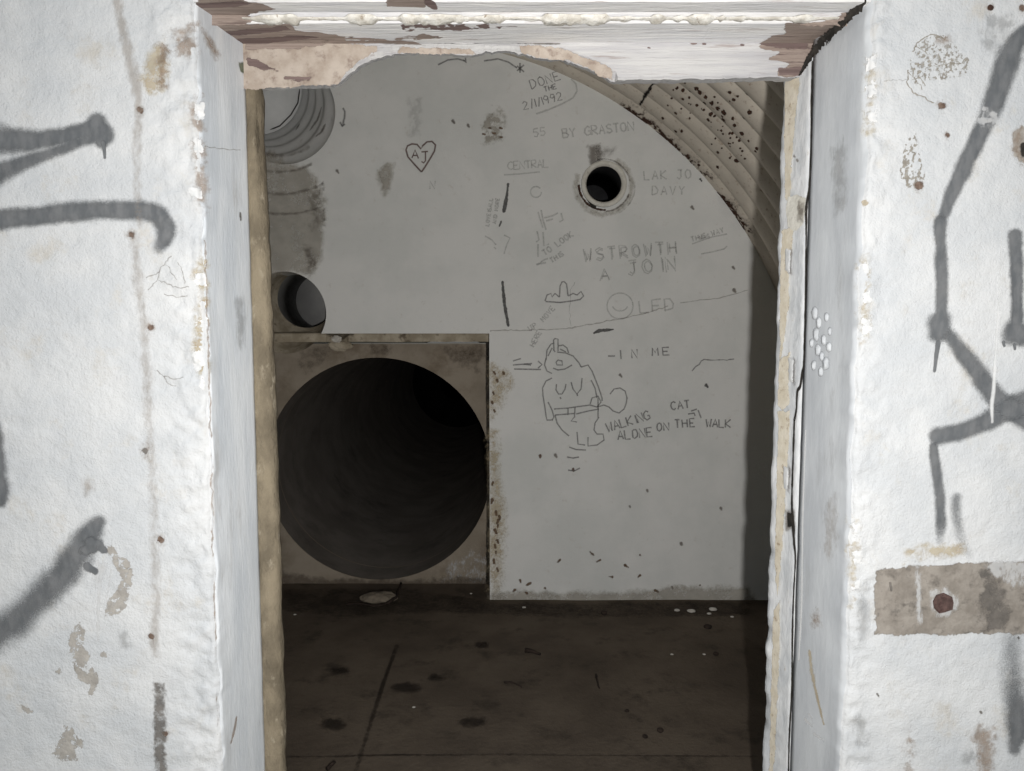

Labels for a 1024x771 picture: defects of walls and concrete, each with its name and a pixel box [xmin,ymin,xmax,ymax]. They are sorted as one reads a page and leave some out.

peeling [196,0,515,90]
spalling [519,45,613,80]
corrosion [617,83,758,180]
damp [266,155,323,273]
corrosion [717,192,751,233]
corrosion [489,451,503,578]
flaking render [95,545,134,616]
flaking render [68,622,107,695]
flaking render [53,725,83,761]